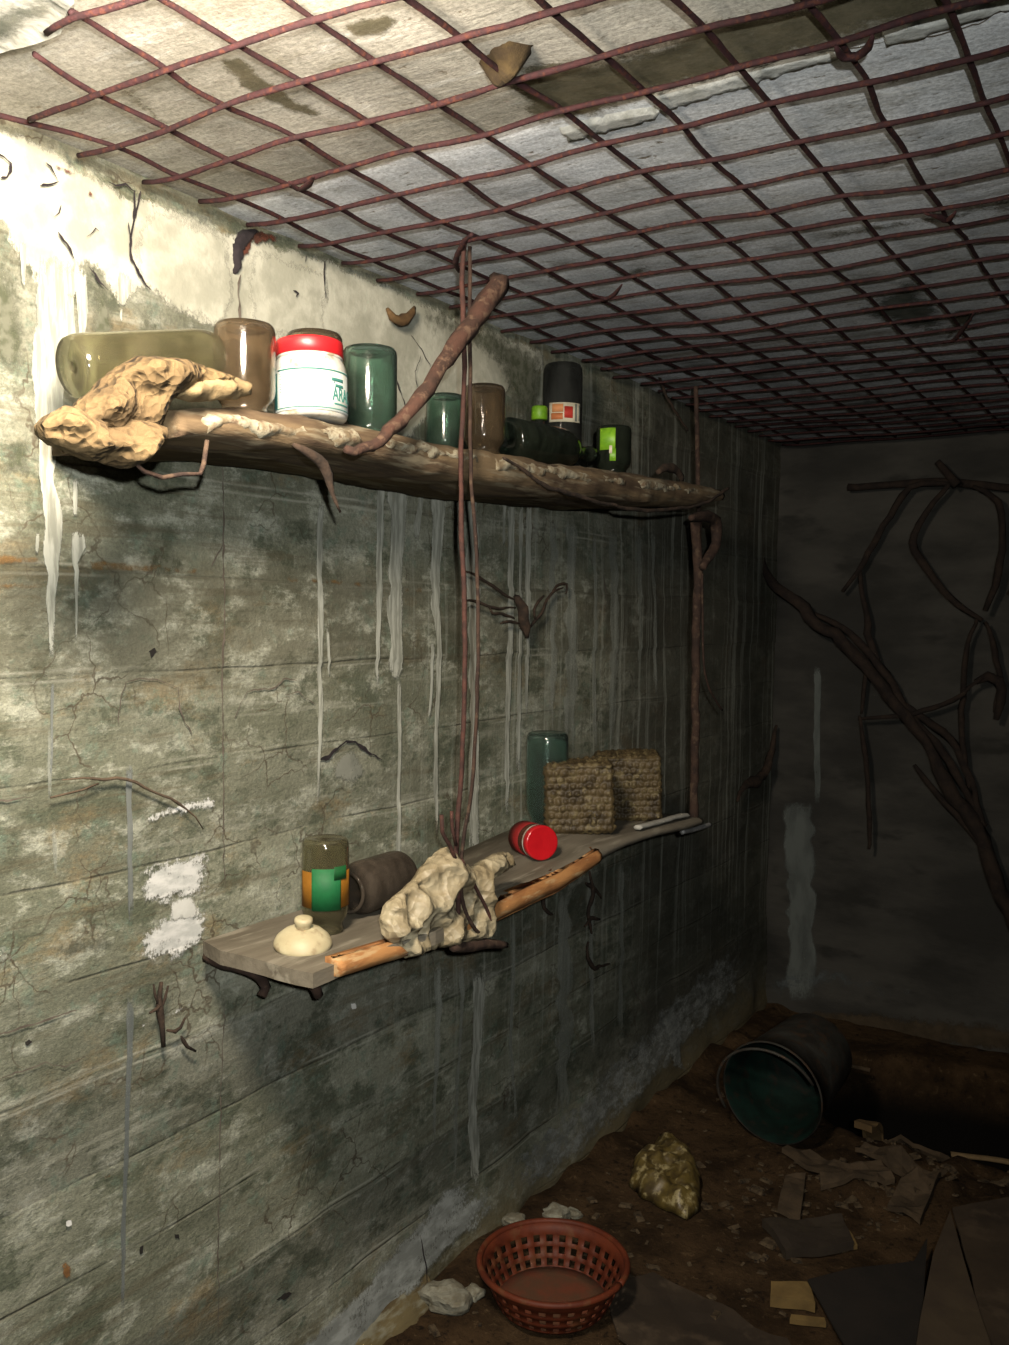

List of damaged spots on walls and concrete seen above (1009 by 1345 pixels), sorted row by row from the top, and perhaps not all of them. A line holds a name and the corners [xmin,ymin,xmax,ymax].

leakage [0,243,131,423]
rust [243,231,276,255]
rust [288,175,315,192]
spalling [0,0,1009,446]
leakage [514,0,963,122]
leakage [8,439,86,656]
crack [118,466,315,888]
leakage [317,504,331,798]
leakage [375,490,445,851]
leakage [465,500,480,846]
crack [217,1006,226,1335]
leakage [306,971,491,1345]